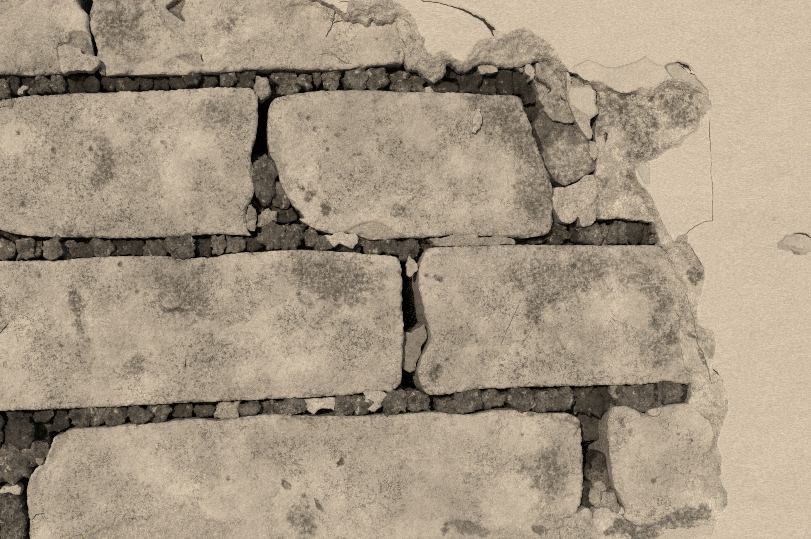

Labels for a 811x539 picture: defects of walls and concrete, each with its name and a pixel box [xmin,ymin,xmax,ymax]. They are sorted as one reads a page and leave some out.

spalling [167,1,184,20]
crack [422,0,495,36]
peeling [573,55,709,97]
crack [686,121,713,271]
flaking render [777,233,811,255]
peeling [405,256,418,277]
spalling [89,505,230,539]
spalling [442,520,490,536]
peeling [656,524,714,539]